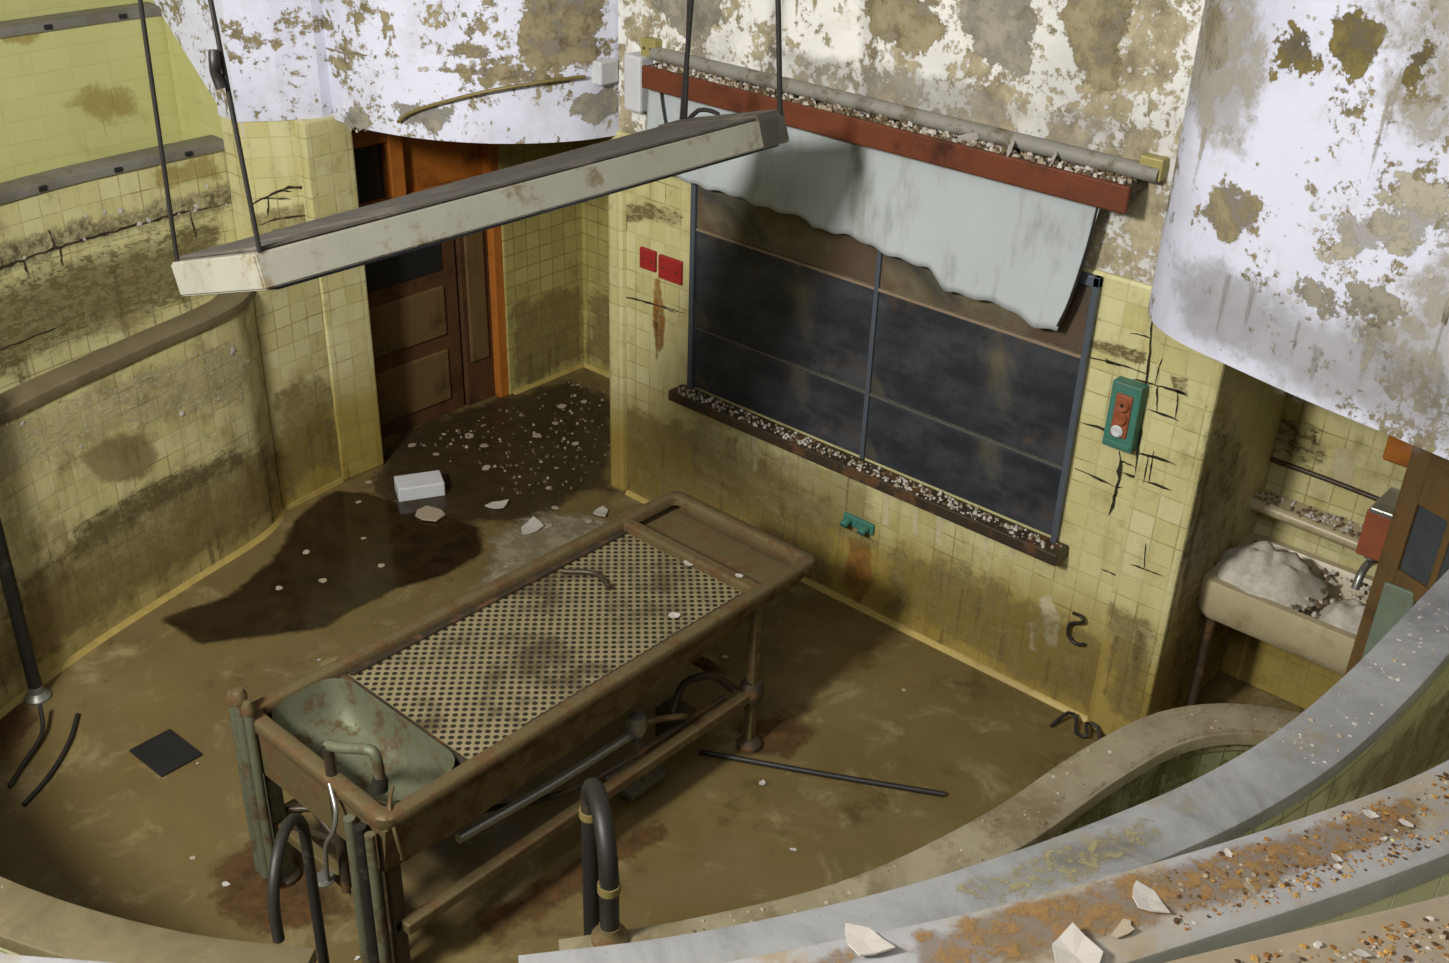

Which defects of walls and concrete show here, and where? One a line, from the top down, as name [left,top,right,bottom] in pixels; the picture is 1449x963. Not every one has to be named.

peeling [417,0,619,125]
peeling [858,0,1145,110]
peeling [1263,4,1449,99]
peeling [391,90,469,139]
crack [0,185,305,275]
peeling [1193,173,1271,244]
peeling [1286,160,1449,343]
crack [0,325,62,350]
leakage [0,220,221,383]
rust [653,279,665,360]
crack [1075,322,1187,515]
crack [1100,545,1164,577]